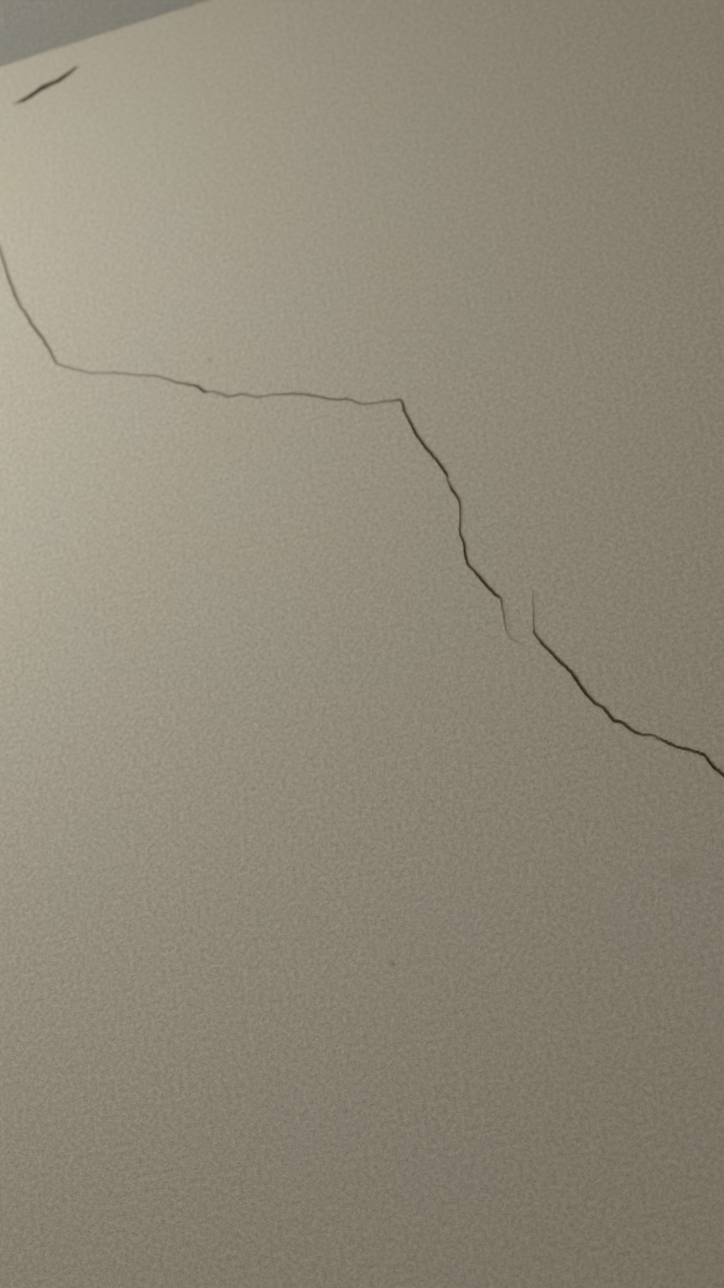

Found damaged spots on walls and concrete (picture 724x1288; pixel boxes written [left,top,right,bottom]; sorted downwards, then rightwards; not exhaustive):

crack [13,65,81,106]
crack [0,240,724,779]